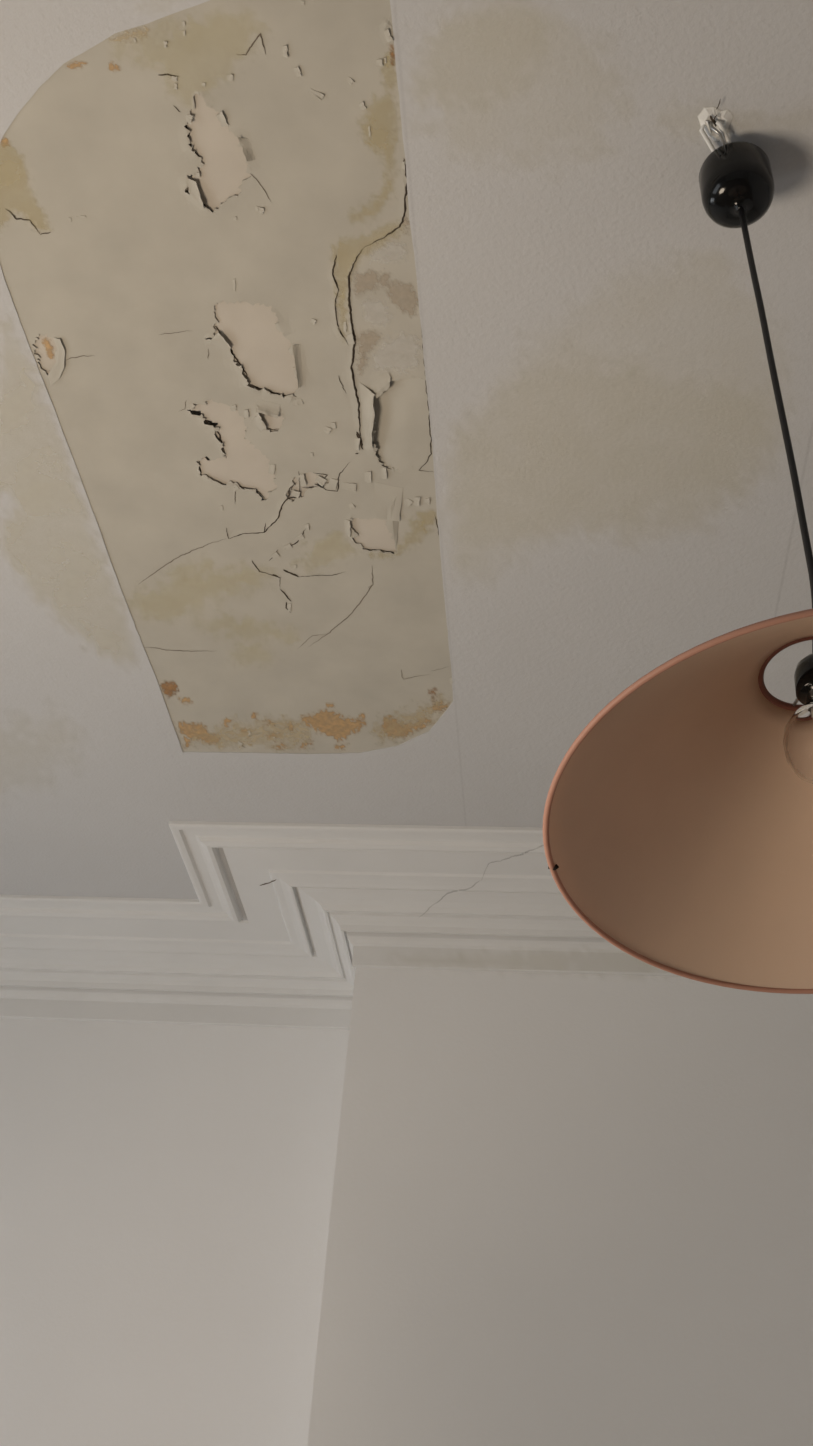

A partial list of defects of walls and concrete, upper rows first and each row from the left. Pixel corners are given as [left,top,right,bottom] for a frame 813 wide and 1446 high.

peeling [0,0,453,754]
crack [139,159,408,649]
crack [421,845,544,916]